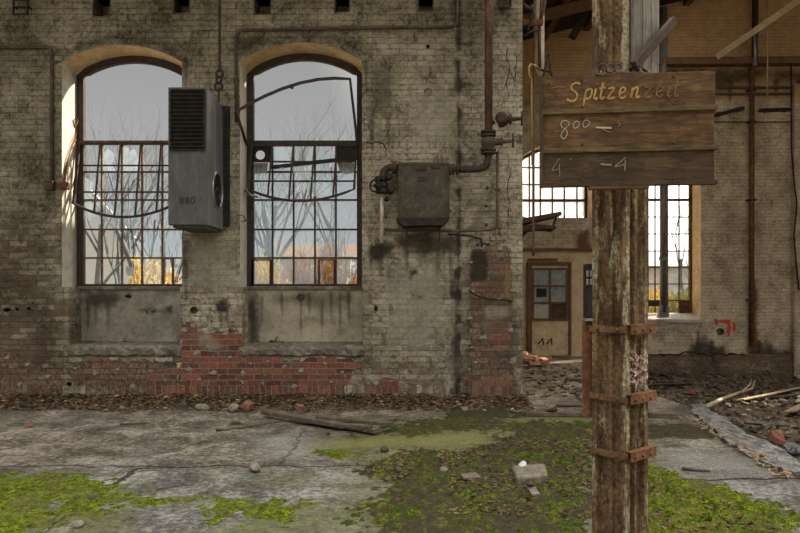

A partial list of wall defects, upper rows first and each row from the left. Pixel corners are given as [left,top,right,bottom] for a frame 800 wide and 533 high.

flaking render [0,306,363,397]
water stain [249,297,258,341]
flaking render [466,244,516,399]